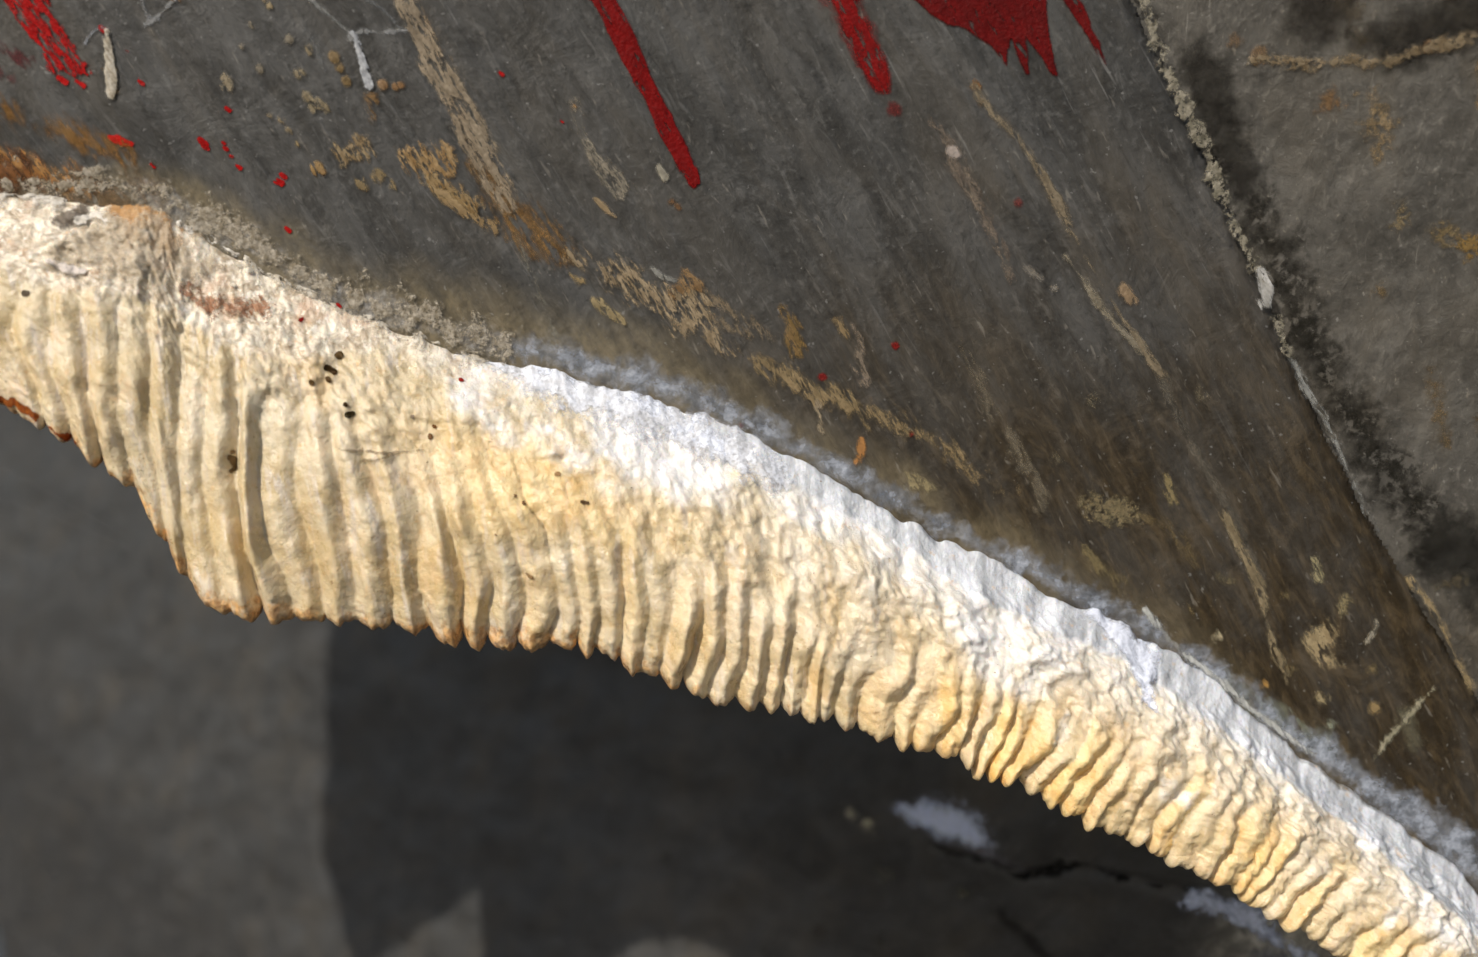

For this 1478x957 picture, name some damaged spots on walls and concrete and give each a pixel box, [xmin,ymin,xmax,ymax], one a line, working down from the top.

rust [0,122,145,207]
water stain [328,0,572,264]
water stain [41,165,291,267]
water stain [368,281,516,361]
water stain [1181,40,1478,615]
water stain [750,355,980,486]
crack [971,80,1289,682]
water stain [1079,593,1161,710]
water stain [1216,676,1358,778]
water stain [896,798,1022,870]
water stain [1360,778,1477,874]
water stain [1178,888,1318,957]